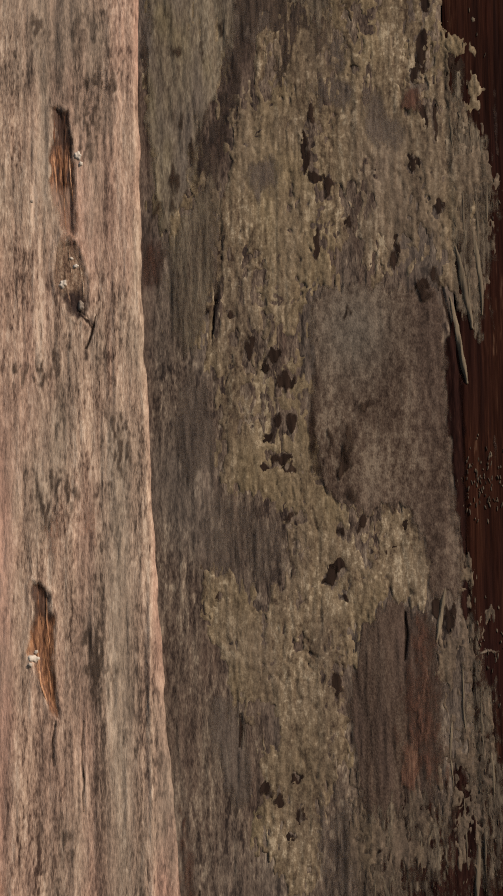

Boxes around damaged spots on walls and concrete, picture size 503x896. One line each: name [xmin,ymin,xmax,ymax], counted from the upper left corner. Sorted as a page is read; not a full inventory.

spalling [389,29,428,102]
peeling [440,27,485,113]
spalling [420,104,438,142]
spalling [300,130,334,199]
spalling [408,153,420,174]
crack [79,312,97,349]
spalling [260,347,296,392]
spalling [263,412,297,443]
spalling [260,453,296,473]
peeling [309,267,477,827]
spalling [260,773,304,808]
peeling [451,802,488,870]